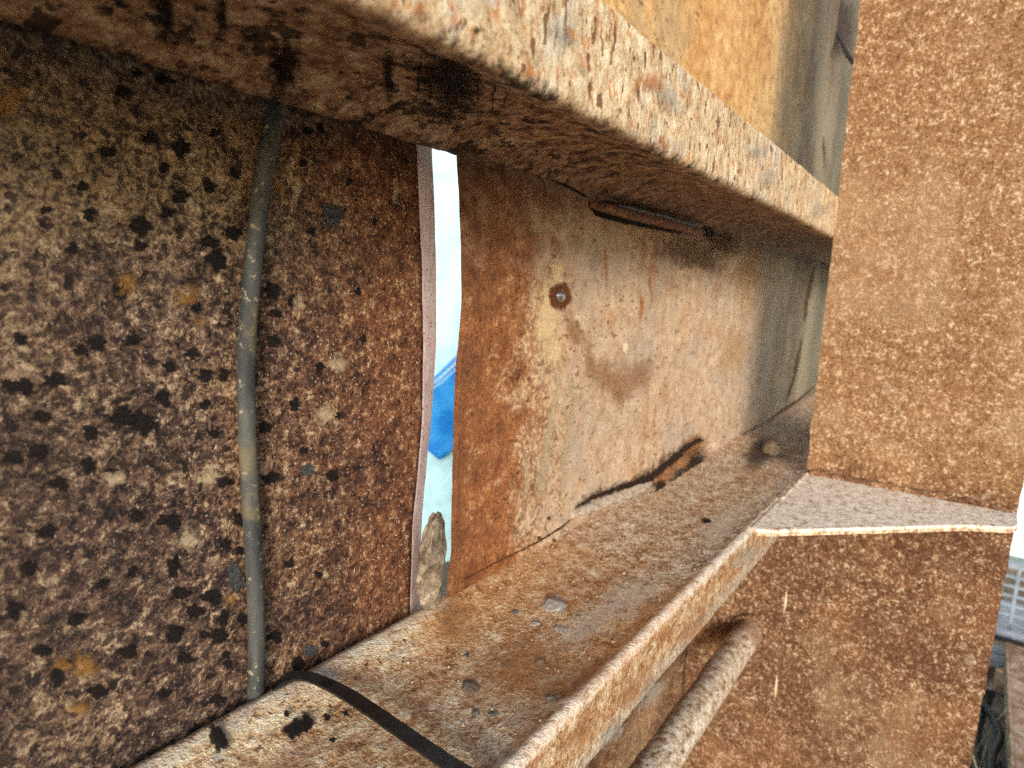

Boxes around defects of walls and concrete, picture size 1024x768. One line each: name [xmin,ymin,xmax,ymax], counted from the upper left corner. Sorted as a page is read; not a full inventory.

water stain [415,55,508,133]
rust [549,282,572,310]
crack [461,520,570,583]